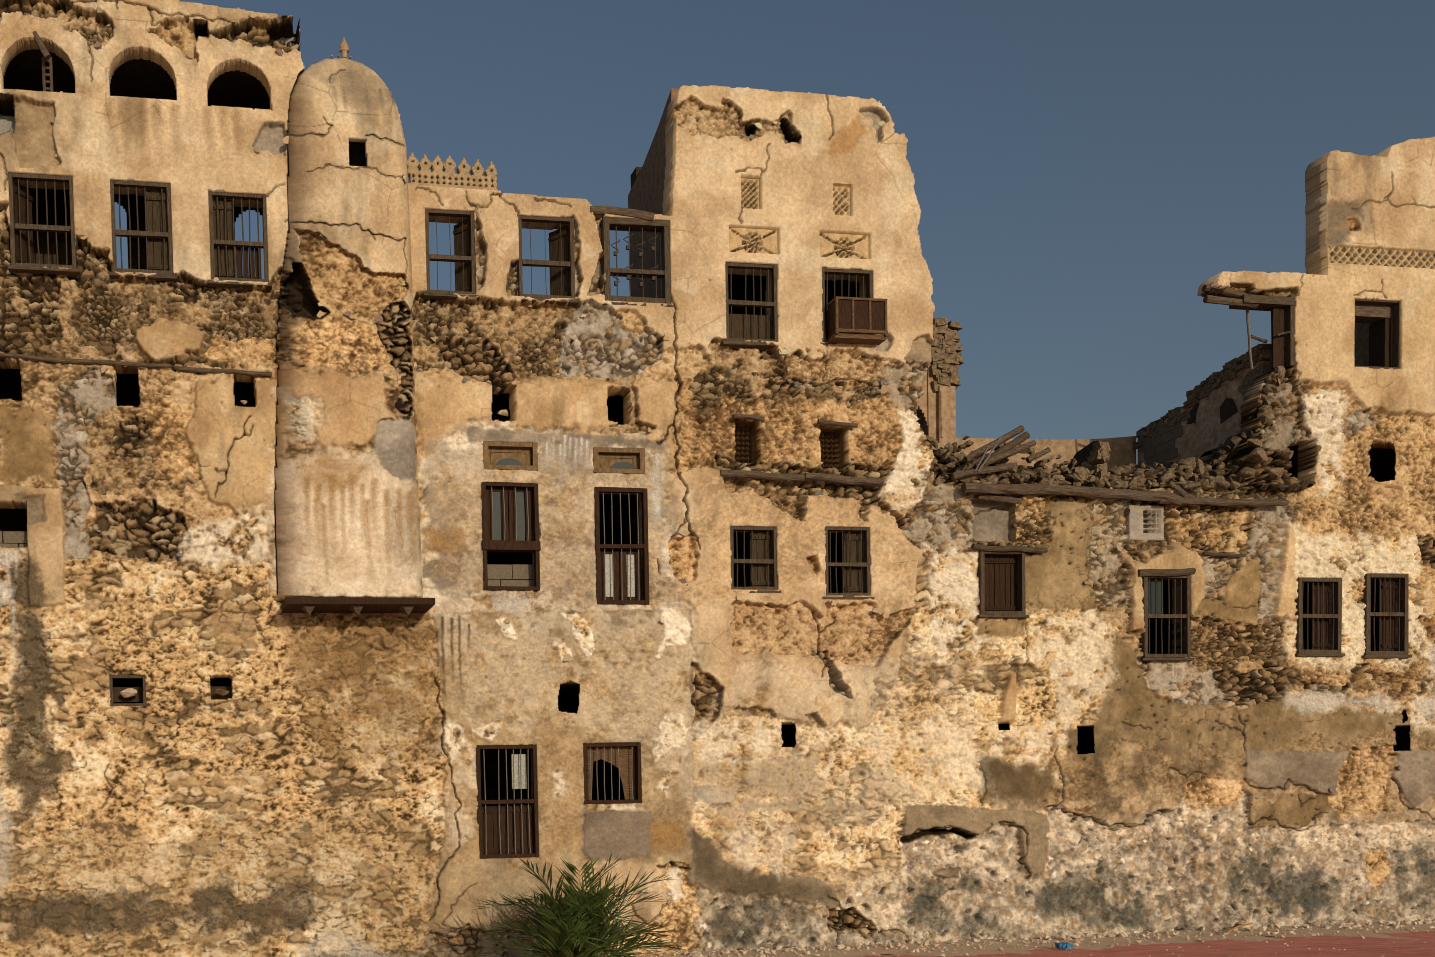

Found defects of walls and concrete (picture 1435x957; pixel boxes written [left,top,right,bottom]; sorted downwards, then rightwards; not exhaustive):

spalling [665,96,800,144]
crack [1351,173,1435,210]
crack [214,416,254,496]
spalling [0,203,671,562]
crack [656,296,701,573]
spalling [677,334,934,522]
crack [812,611,836,677]
spalling [1136,496,1431,706]
spalling [1417,535,1435,569]
crack [429,679,477,924]
spalling [653,662,776,796]
crack [1215,716,1327,832]